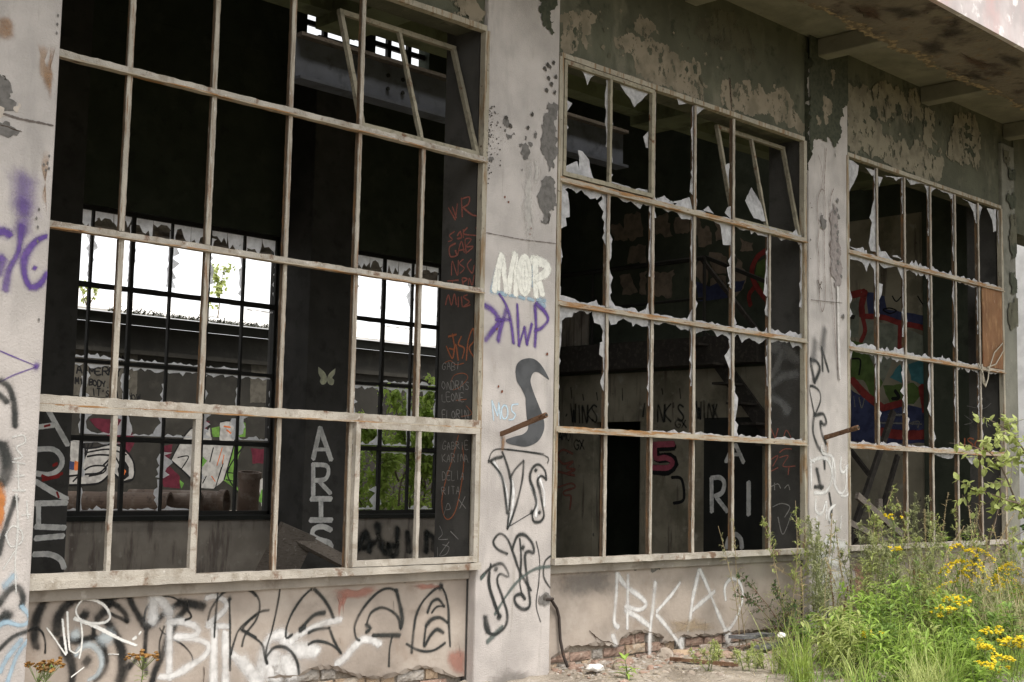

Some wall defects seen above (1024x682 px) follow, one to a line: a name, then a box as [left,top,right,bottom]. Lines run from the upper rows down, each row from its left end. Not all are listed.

peeling [797,0,1024,110]
spalling [0,75,21,138]
peeling [487,0,981,224]
flaking render [268,665,456,682]
flaking render [550,628,753,669]